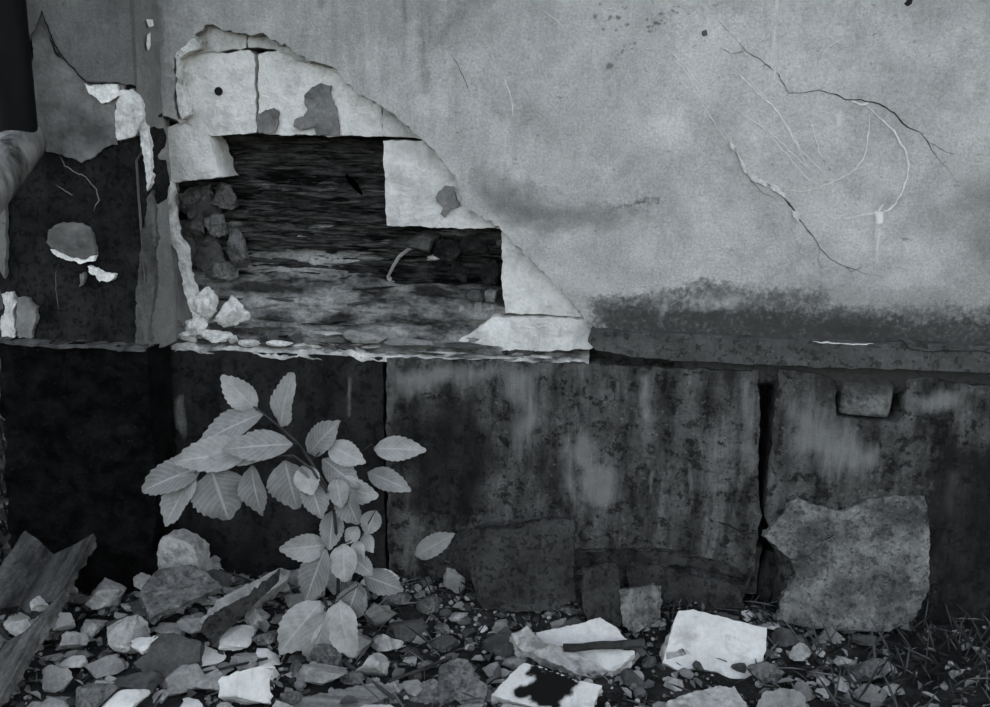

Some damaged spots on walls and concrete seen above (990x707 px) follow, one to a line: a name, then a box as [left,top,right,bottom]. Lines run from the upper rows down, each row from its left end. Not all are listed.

crack [717,19,954,176]
flaking render [84,26,593,364]
crack [675,60,885,278]
flaking render [46,222,118,287]
flaking render [0,291,40,338]
damp [594,281,990,344]
damp [684,361,990,409]